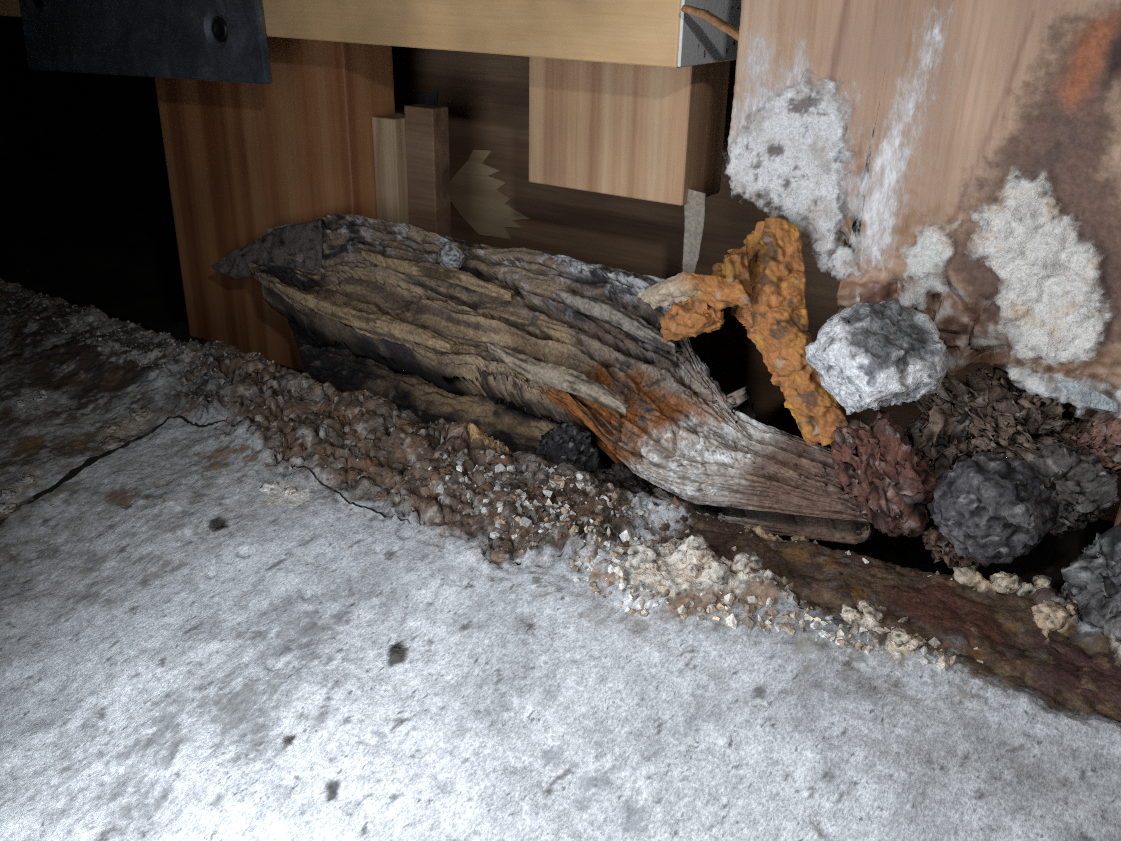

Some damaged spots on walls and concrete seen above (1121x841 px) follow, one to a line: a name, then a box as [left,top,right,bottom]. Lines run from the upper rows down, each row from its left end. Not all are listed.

damp [726,25,942,279]
damp [899,11,1121,418]
peeling [1056,378,1119,413]
crack [0,415,222,525]
crack [267,446,410,523]
spalling [185,339,633,564]
damp [744,524,818,544]
spalling [387,643,408,666]
damp [839,600,923,664]
corrosion [674,502,1121,723]
damp [952,563,1080,640]